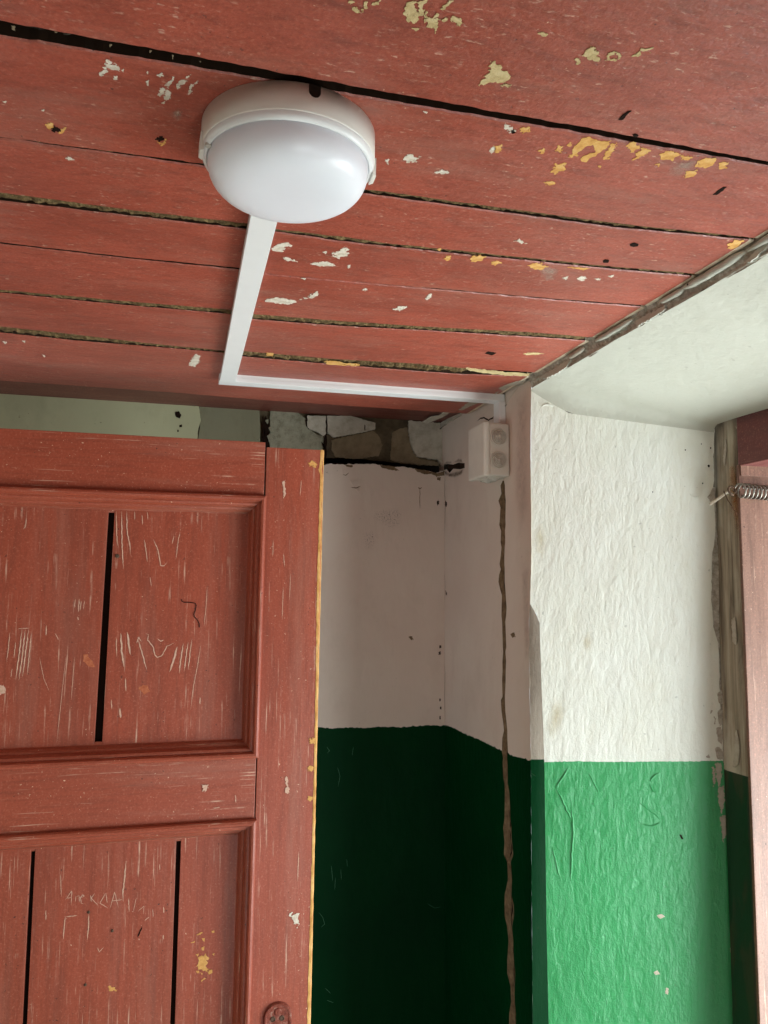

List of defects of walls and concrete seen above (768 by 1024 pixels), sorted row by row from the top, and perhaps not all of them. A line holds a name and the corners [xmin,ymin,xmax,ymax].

peeling [403,0,463,34]
peeling [99,44,124,80]
peeling [146,71,197,104]
peeling [478,61,512,88]
peeling [574,46,653,65]
peeling [538,134,729,186]
peeling [272,242,351,269]
peeling [265,291,319,305]
flaking render [466,233,768,394]
flaking render [307,402,477,481]
flaking render [706,487,726,842]
crack [498,481,516,1024]